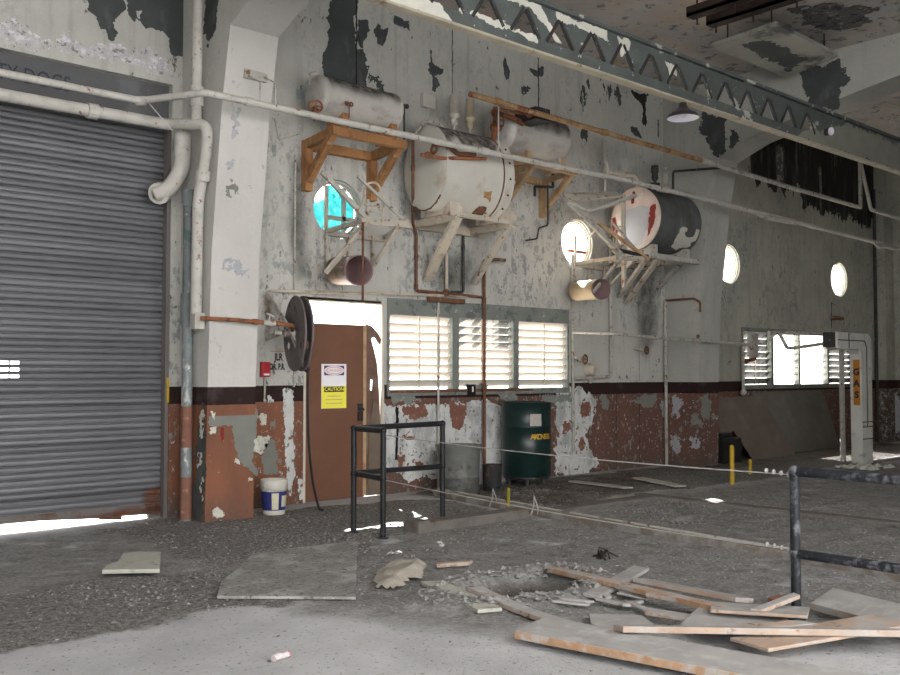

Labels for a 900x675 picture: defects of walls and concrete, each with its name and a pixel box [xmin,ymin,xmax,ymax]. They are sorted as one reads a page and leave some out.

peeling [87,0,184,57]
peeling [203,0,219,48]
peeling [322,0,410,91]
peeling [428,50,444,92]
peeling [800,58,851,110]
spalling [786,2,880,31]
peeling [699,111,740,157]
peeling [748,138,874,230]
peeling [192,388,303,521]
flaking render [384,383,518,484]
flaking render [539,386,610,476]
rust [72,488,160,522]